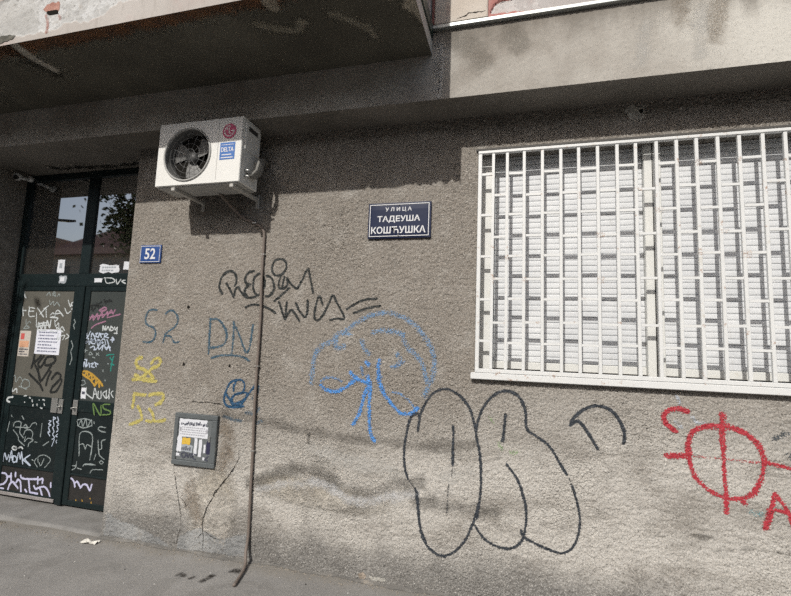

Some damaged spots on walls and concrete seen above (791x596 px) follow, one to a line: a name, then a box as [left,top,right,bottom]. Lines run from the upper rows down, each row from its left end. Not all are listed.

flaking render [0,0,128,76]
crack [198,453,239,545]